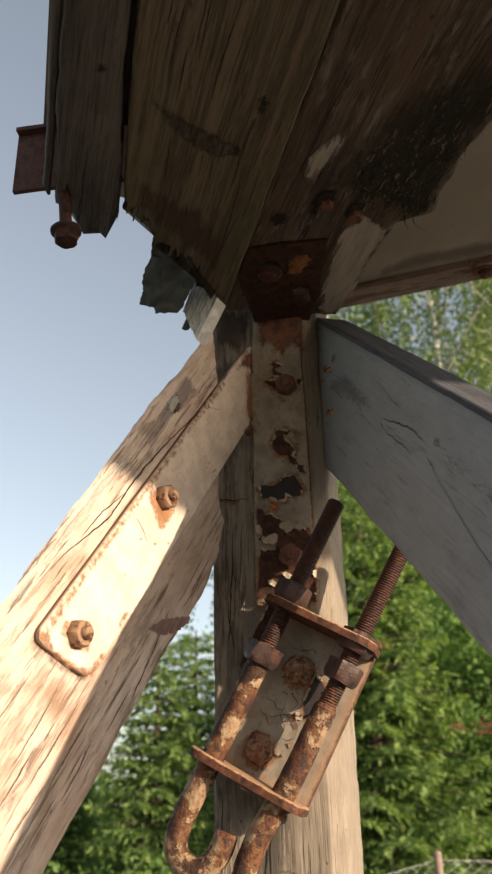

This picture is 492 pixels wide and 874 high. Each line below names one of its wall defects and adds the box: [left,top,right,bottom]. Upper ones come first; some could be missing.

rust [288,254,312,275]
rust [237,317,304,436]
rust [54,522,124,636]
crack [43,418,192,577]
crack [222,528,246,645]
peeling [252,429,312,641]
peeling [305,564,319,605]
crack [377,381,492,569]
rust [40,632,104,677]
crack [0,571,204,841]
crack [251,643,328,748]